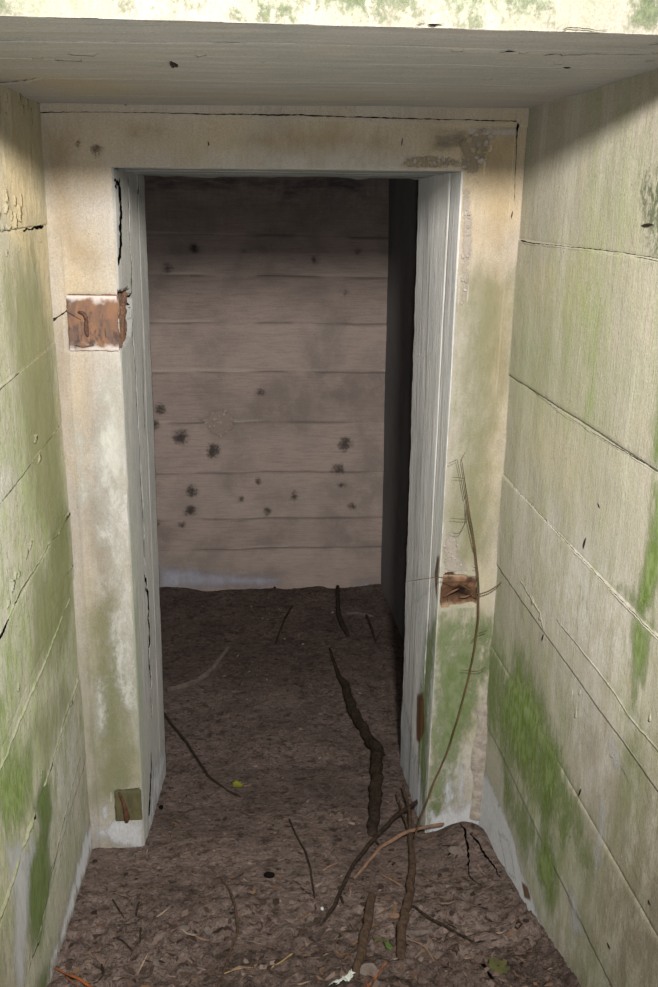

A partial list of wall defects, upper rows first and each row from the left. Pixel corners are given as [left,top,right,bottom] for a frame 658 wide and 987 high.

damp [376,0,422,23]
damp [631,0,658,30]
spalling [405,129,495,172]
crack [114,178,153,722]
damp [630,484,658,699]
damp [0,749,51,834]
damp [400,703,555,924]
damp [9,844,35,987]